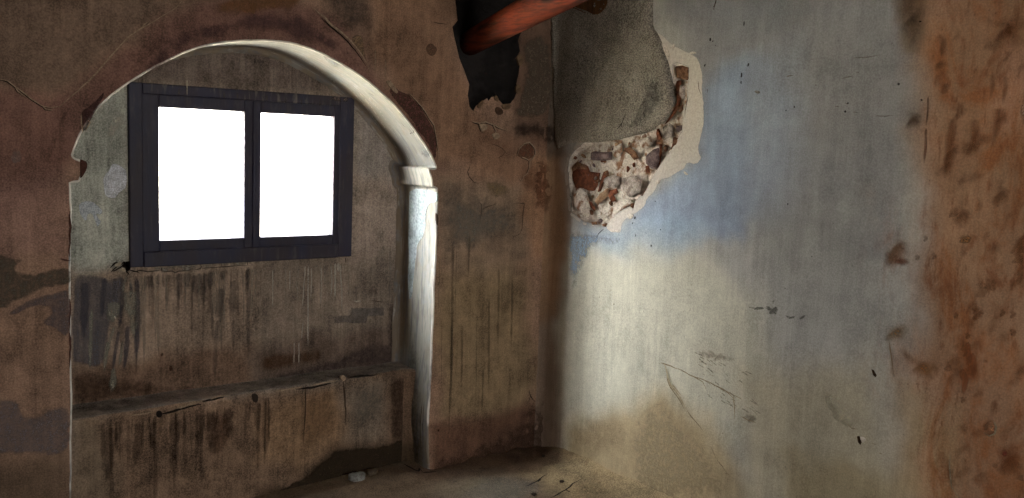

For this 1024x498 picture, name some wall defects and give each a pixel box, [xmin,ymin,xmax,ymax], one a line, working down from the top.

peeling [386,80,439,159]
spalling [452,0,523,139]
spalling [564,34,706,233]
leakage [272,263,393,377]